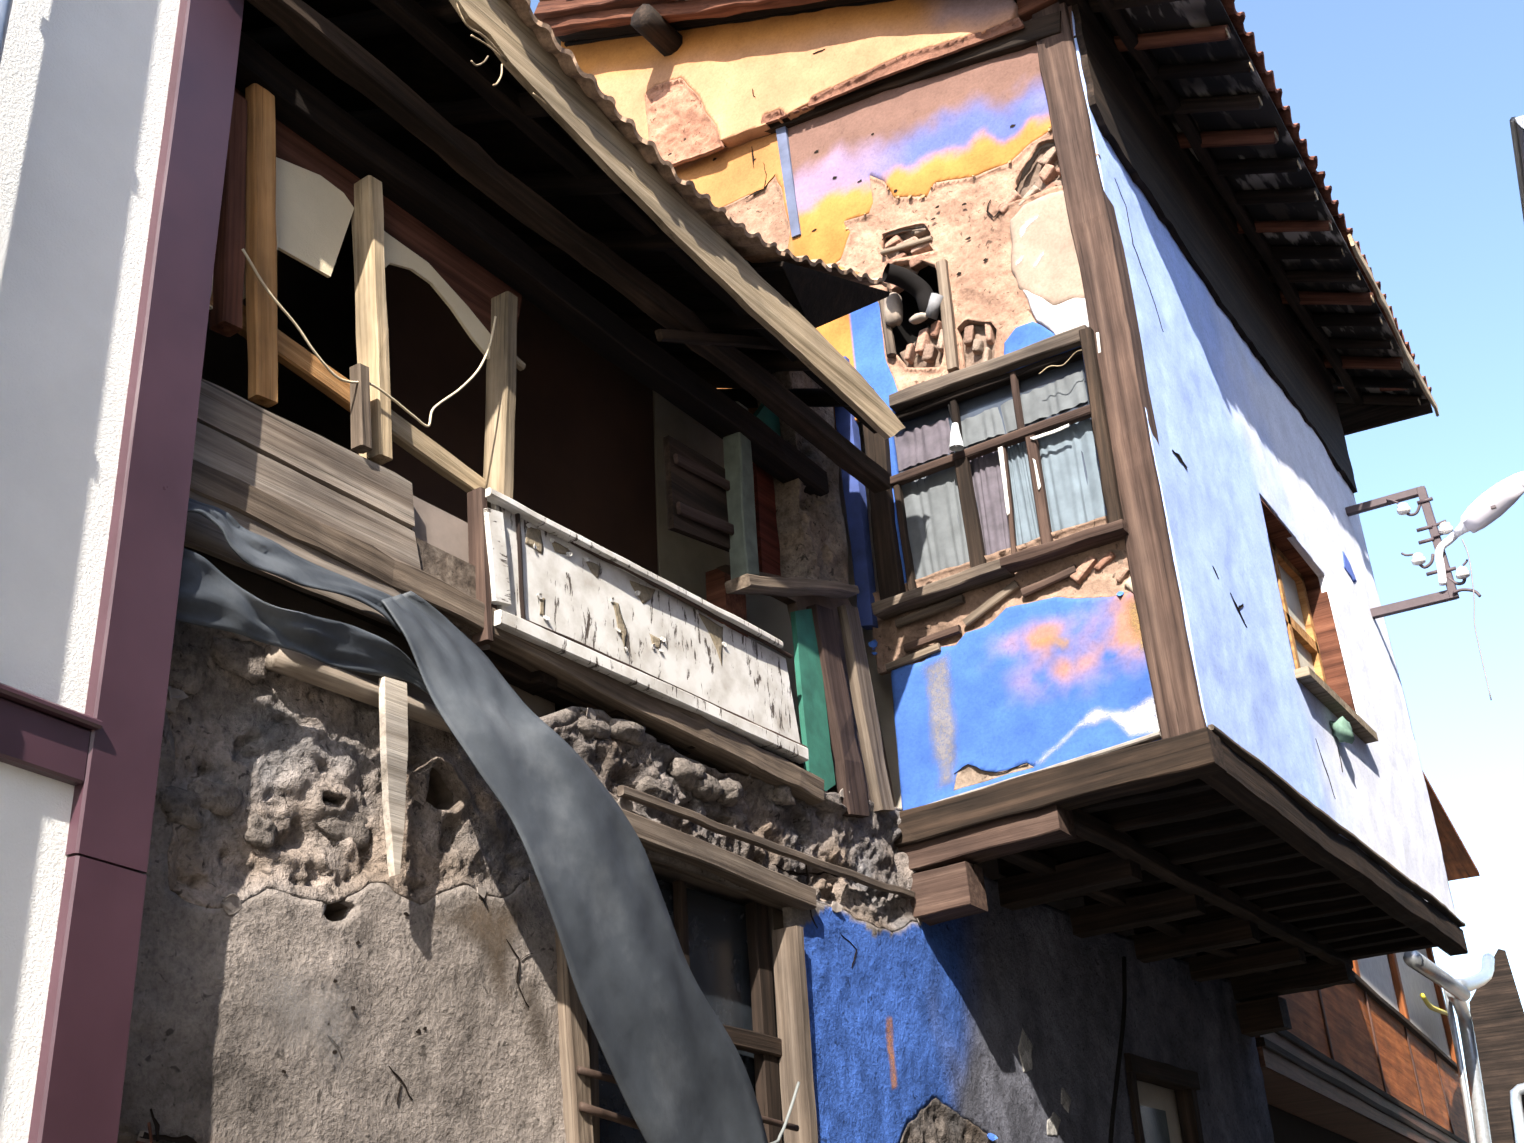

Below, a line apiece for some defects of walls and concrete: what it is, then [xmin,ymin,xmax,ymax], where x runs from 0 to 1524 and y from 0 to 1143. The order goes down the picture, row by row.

flaking render [836,127,1101,391]
peeling [525,523,600,578]
peeling [537,593,551,620]
peeling [610,597,628,652]
peeling [630,580,659,604]
peeling [649,633,666,652]
peeling [696,609,727,665]
flaking render [165,621,538,916]
flaking render [953,764,1034,791]
flaking render [554,708,922,932]
flaking render [900,1098,998,1143]
peeling [1047,1088,1071,1136]